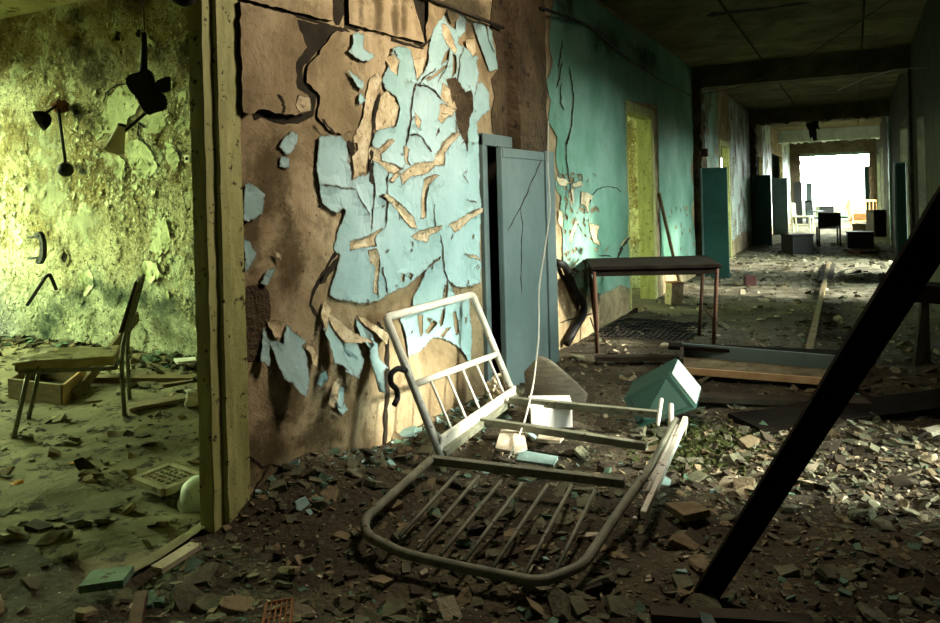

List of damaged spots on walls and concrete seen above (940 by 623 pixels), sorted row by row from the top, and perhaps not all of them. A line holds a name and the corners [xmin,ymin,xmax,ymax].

spalling [112,23,156,47]
crack [238,0,429,49]
peeling [91,85,180,181]
crack [556,39,621,204]
peeling [546,0,752,299]
hole [58,247,70,267]
peeling [78,270,94,296]
peeling [139,218,171,283]
peeling [236,0,509,415]
crack [508,161,541,293]